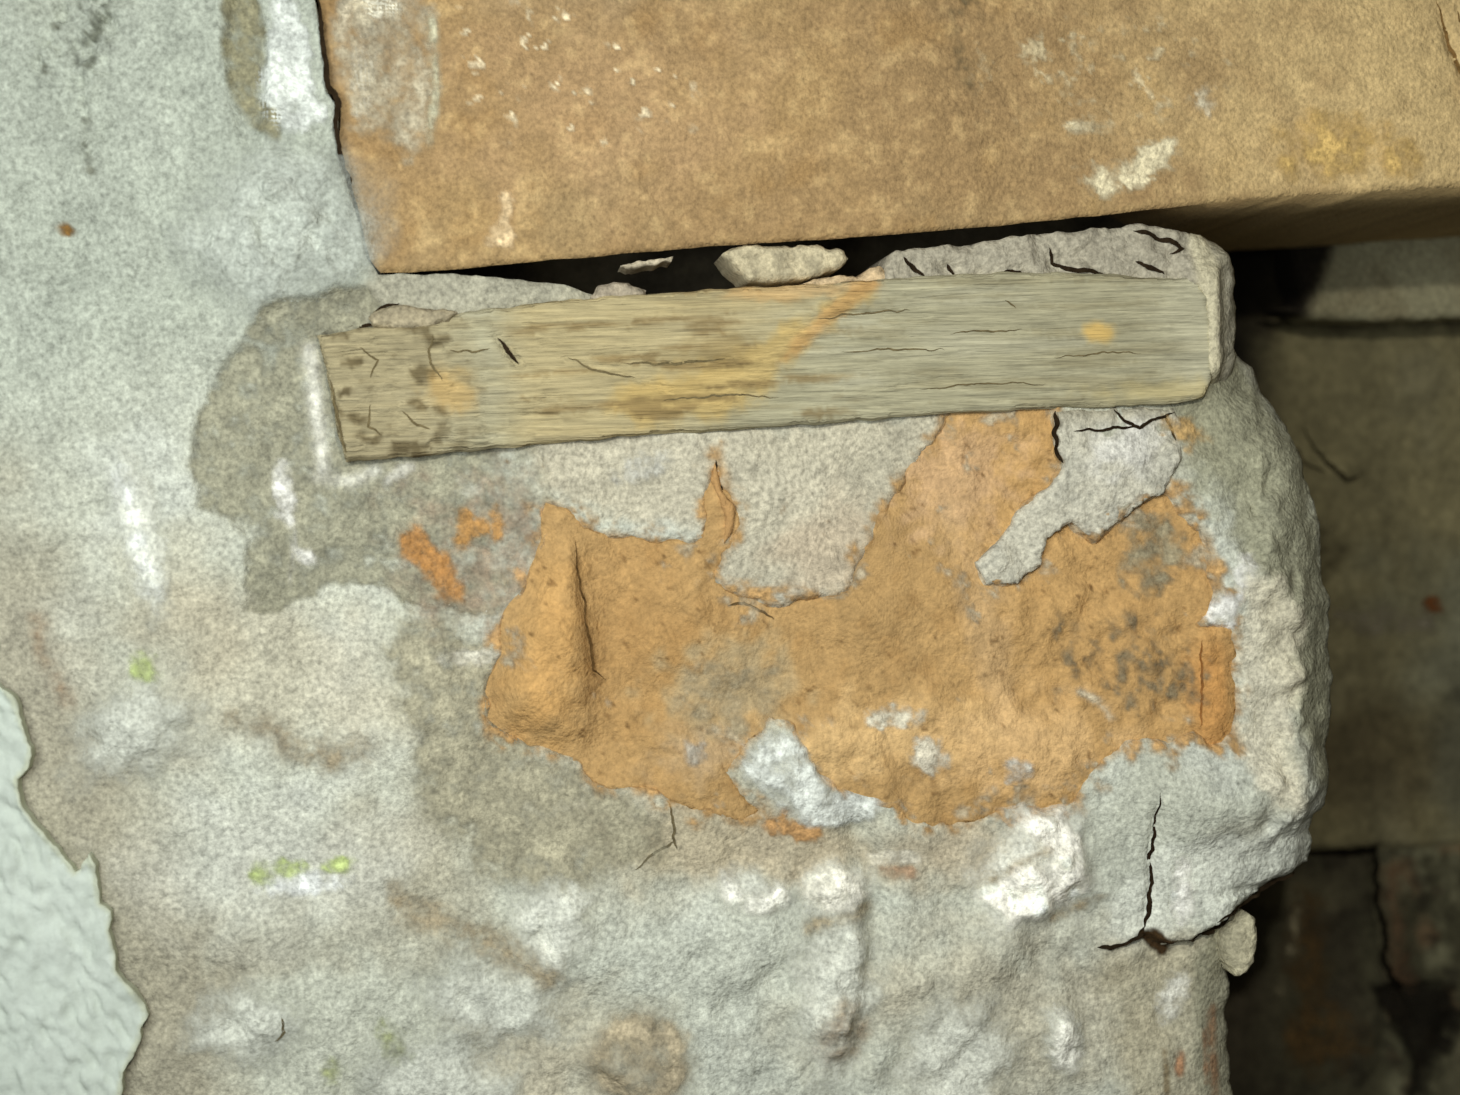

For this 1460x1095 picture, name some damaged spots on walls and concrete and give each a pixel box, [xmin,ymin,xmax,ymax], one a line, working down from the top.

crack [1436,2,1460,74]
crack [1076,410,1176,440]
spalling [401,509,502,598]
spalling [481,407,1243,842]
crack [1098,797,1161,950]